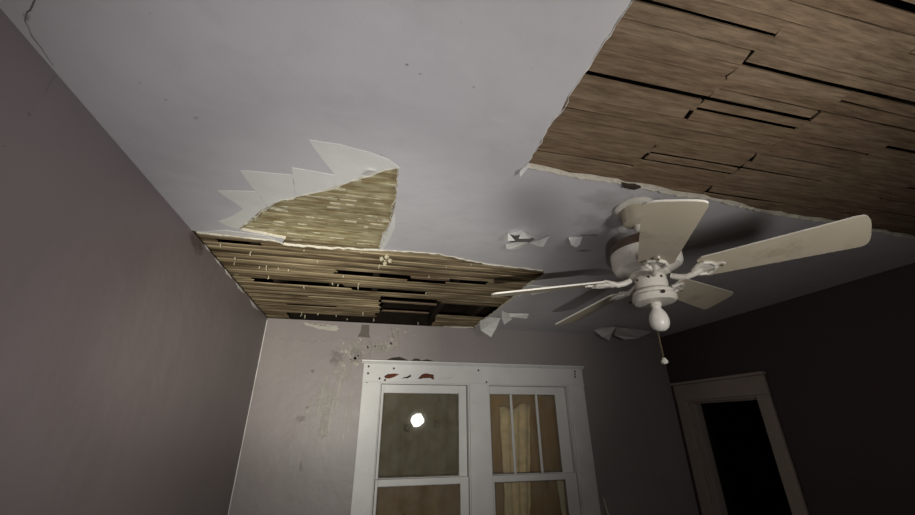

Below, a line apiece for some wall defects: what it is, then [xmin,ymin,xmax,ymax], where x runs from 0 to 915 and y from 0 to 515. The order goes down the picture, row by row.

crack [24,0,55,91]
flaking render [520,0,634,185]
peeling [196,140,549,337]